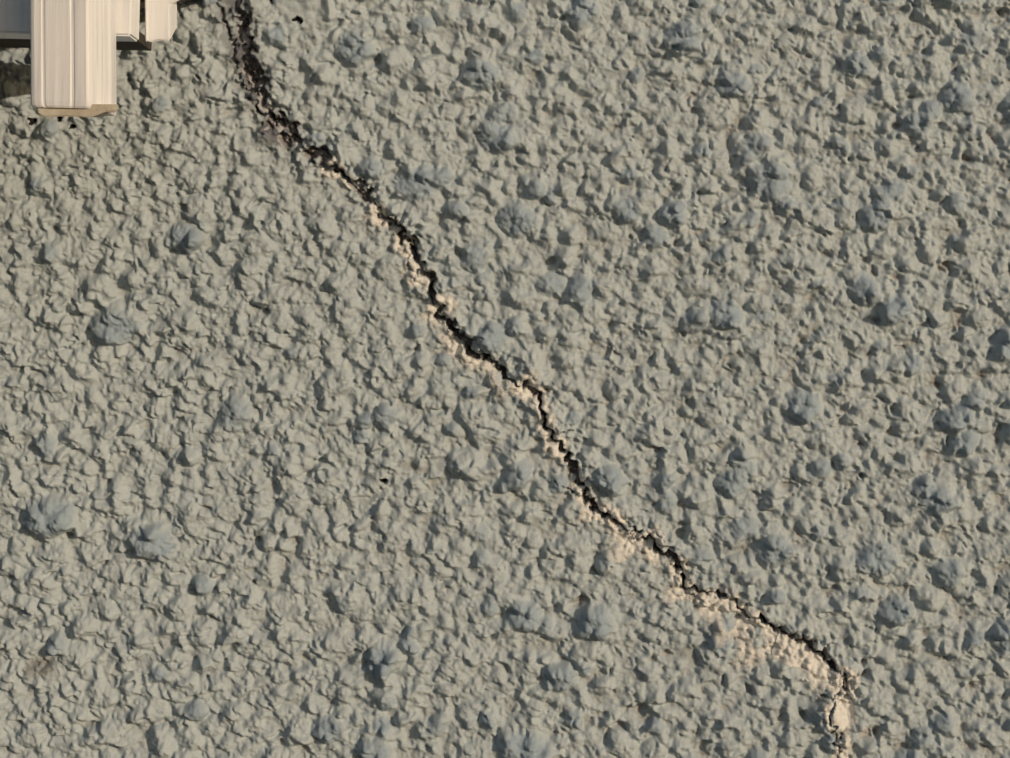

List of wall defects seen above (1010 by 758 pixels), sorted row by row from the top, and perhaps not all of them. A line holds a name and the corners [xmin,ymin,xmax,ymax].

crack [221,0,847,743]